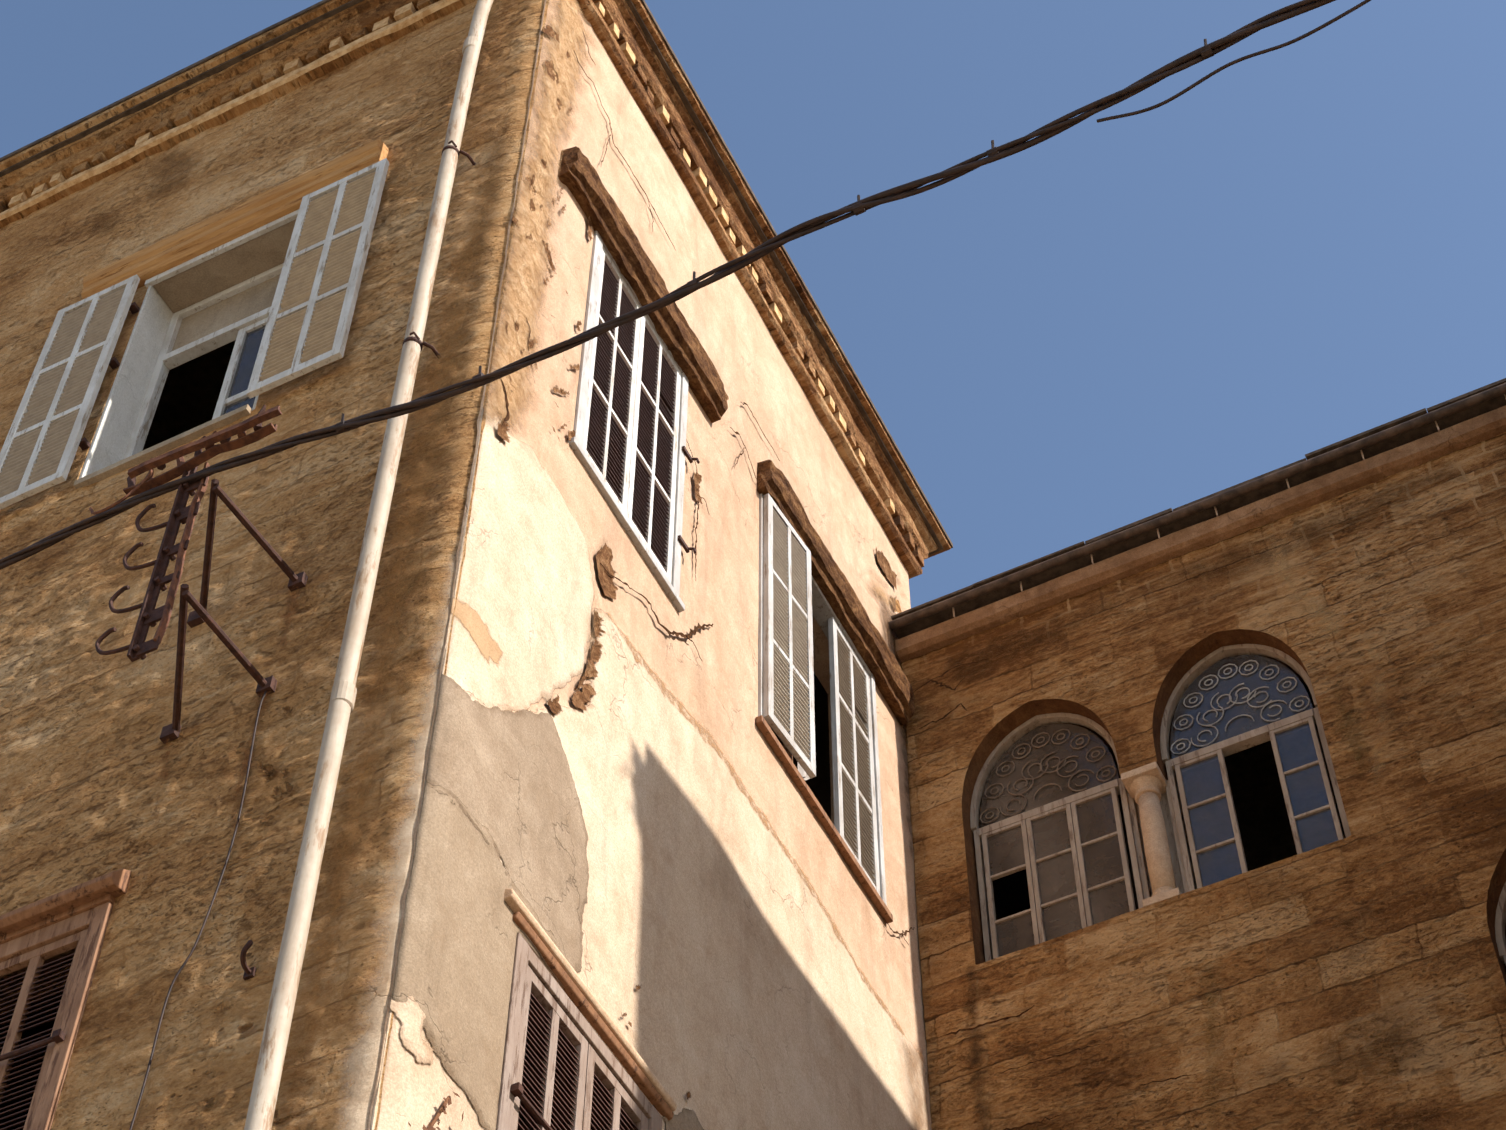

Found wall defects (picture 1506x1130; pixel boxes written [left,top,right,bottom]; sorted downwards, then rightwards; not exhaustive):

crack [687,402,780,581]
flaking render [547,611,605,715]
flaking render [596,543,618,600]
crack [600,563,714,660]